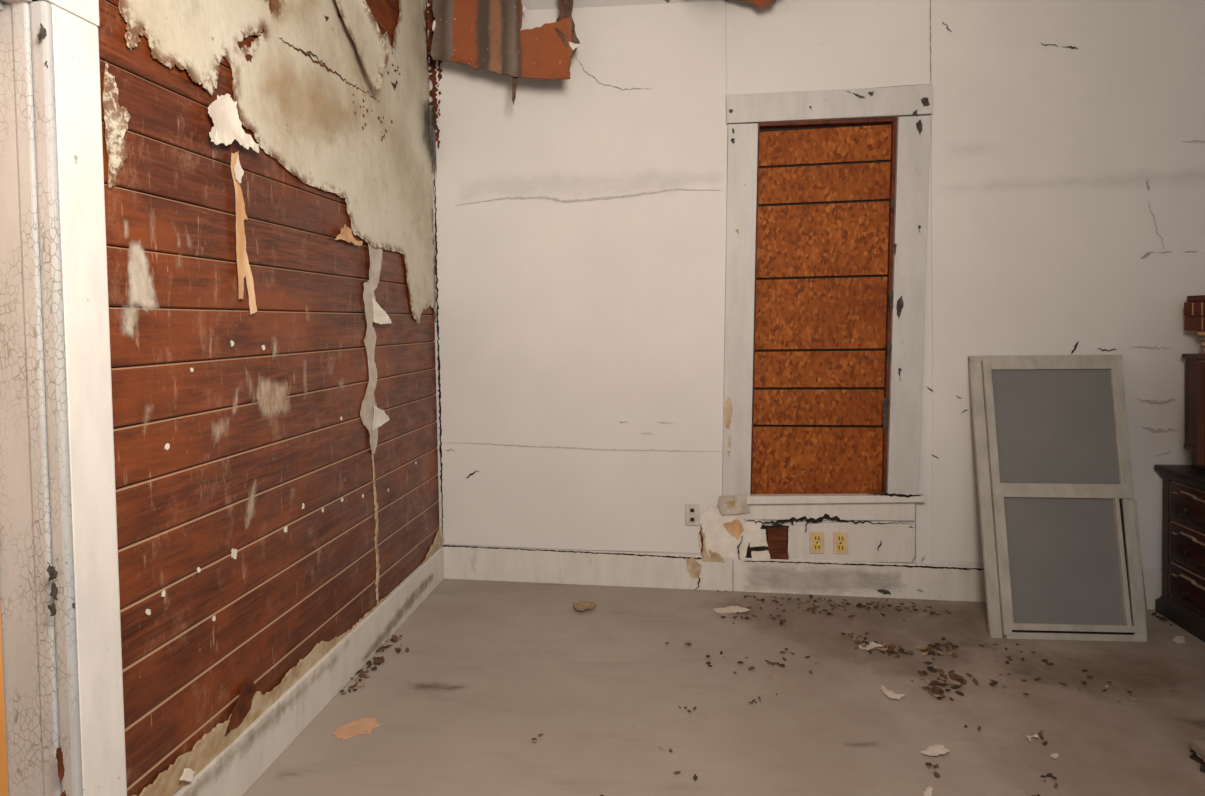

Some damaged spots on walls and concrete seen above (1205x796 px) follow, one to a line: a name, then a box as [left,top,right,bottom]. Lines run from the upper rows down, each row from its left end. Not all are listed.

peeling [324,0,396,95]
peeling [102,61,130,188]
peeling [208,94,259,184]
peeling [123,243,157,335]
spalling [132,224,401,796]
spalling [421,526,443,565]
spalling [699,494,789,563]